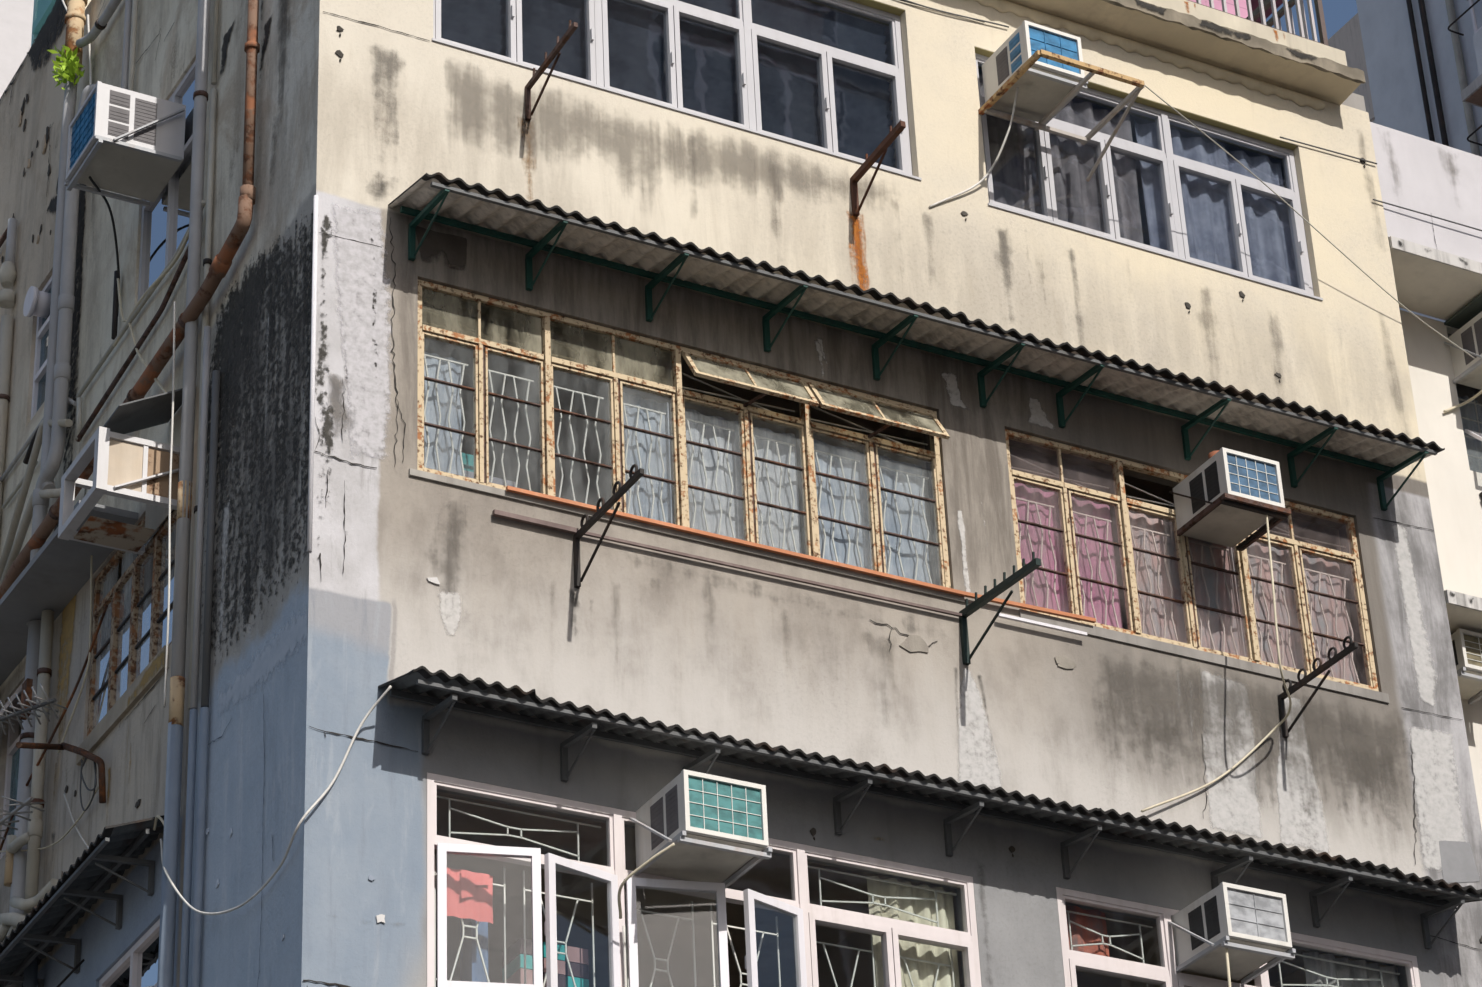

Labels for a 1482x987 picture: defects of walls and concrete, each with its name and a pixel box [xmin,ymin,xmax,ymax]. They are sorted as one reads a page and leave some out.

leakage [658,141,822,185]
corrosion [849,215,869,291]
leakage [201,213,347,661]
peeling [427,577,461,635]
leakage [1100,667,1397,788]